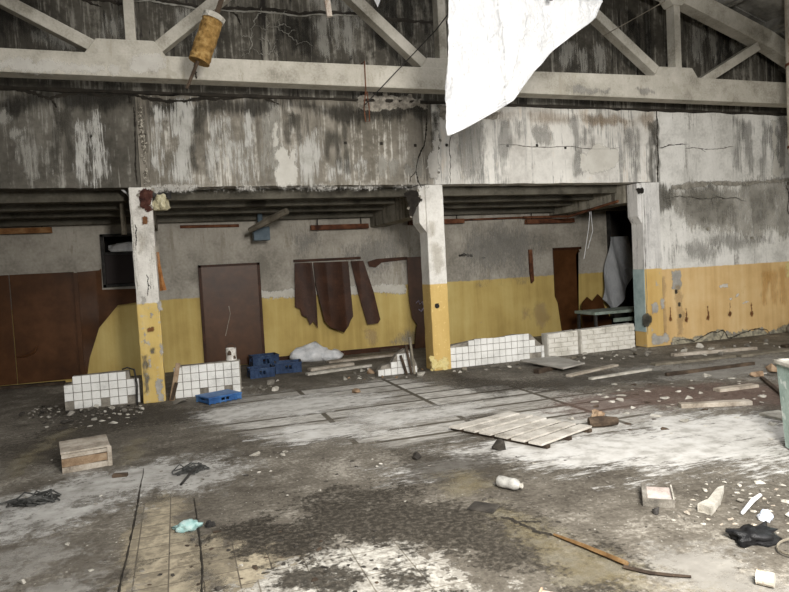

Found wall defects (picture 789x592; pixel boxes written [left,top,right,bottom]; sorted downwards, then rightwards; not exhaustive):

water stain [559,41,605,72]
water stain [0,84,132,189]
water stain [150,96,439,194]
crack [410,115,427,188]
crack [656,111,732,182]
peeling [671,270,682,290]
flaking render [643,299,788,345]
peeling [143,332,164,401]